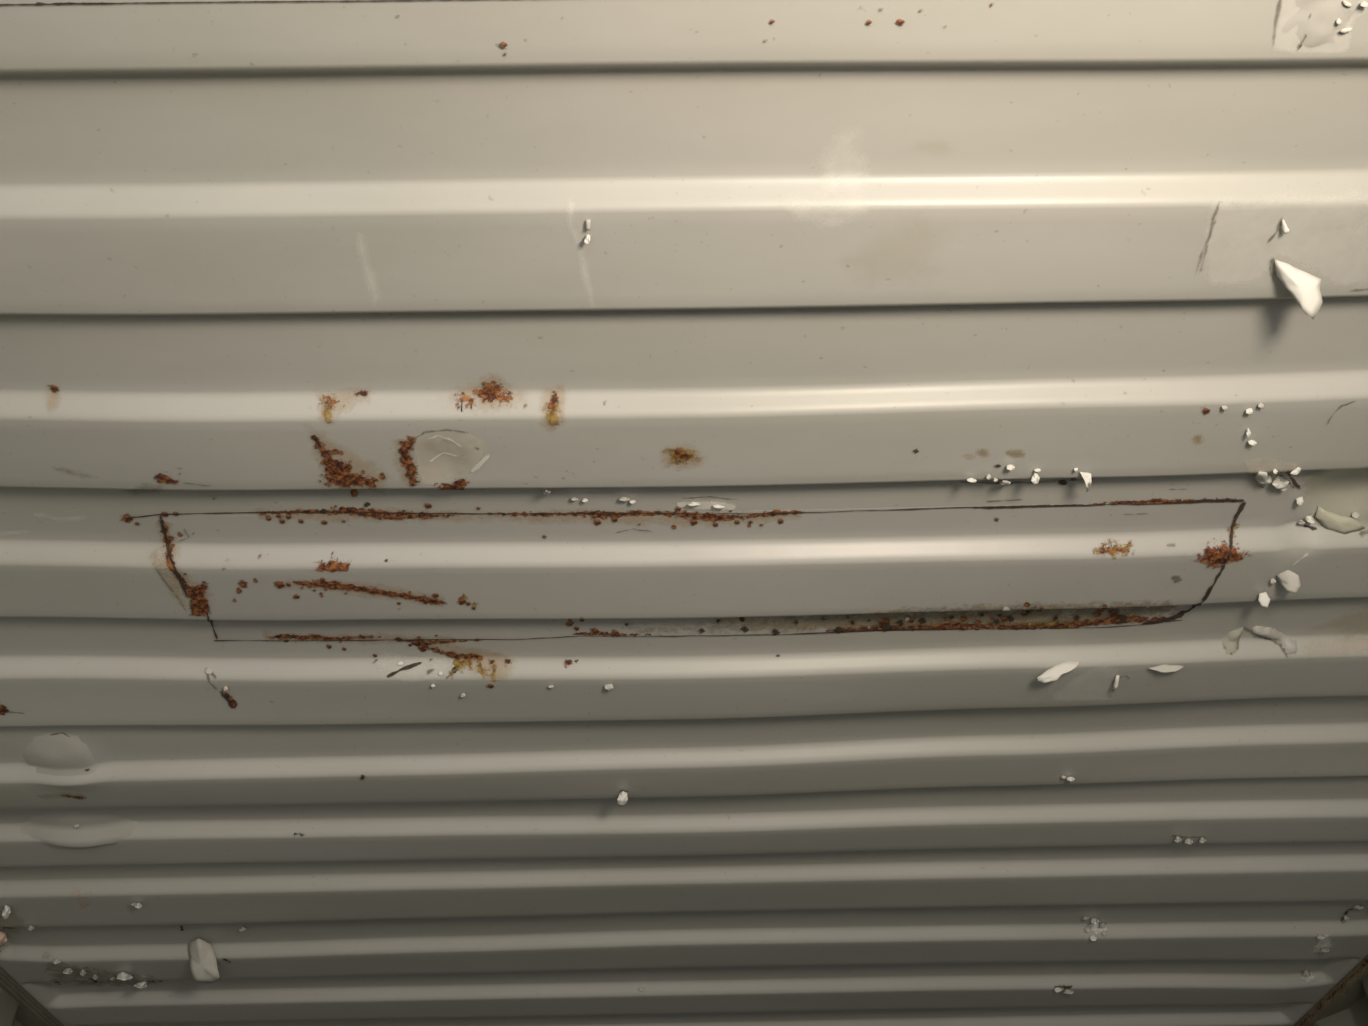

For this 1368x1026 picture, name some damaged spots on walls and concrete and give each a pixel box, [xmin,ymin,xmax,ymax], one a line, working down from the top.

peeling [1270,259,1323,319]
rust [455,381,526,410]
rust [311,435,386,497]
rust [398,436,469,490]
peeling [1254,467,1301,491]
rust [275,552,477,610]
crack [121,489,1249,708]
peeling [1258,553,1308,608]
rust [414,640,511,689]
peeling [1037,661,1080,683]
crack [0,705,24,716]
peeling [180,926,231,983]